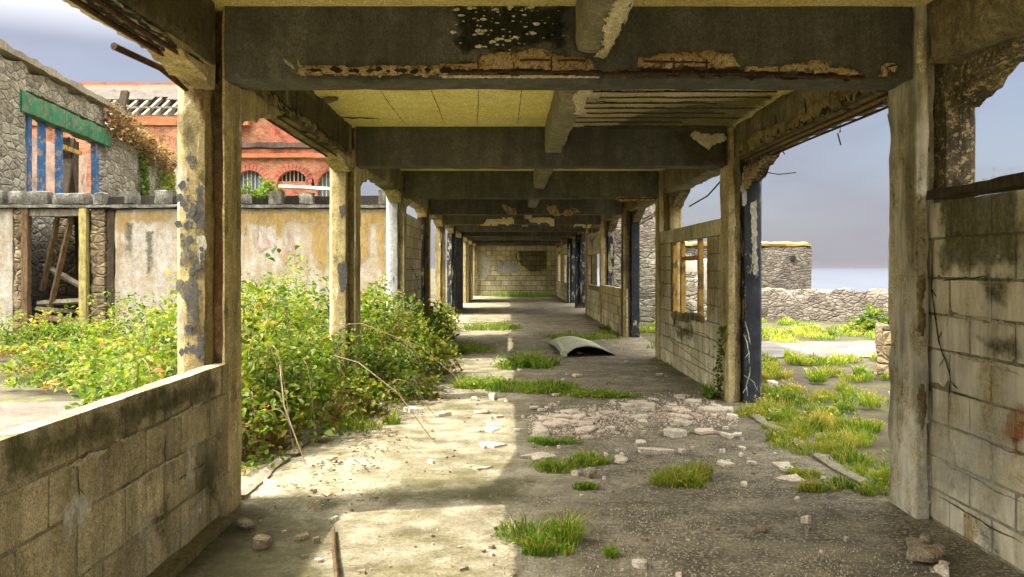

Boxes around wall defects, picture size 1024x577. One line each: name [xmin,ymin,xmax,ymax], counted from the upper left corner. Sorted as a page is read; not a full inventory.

spalling [878,62,897,77]
peeling [283,0,890,275]
peeling [174,148,207,368]
leakage [988,340,1016,357]
leakage [11,376,215,475]
corrosion [1002,405,1024,454]
leakage [63,495,92,536]